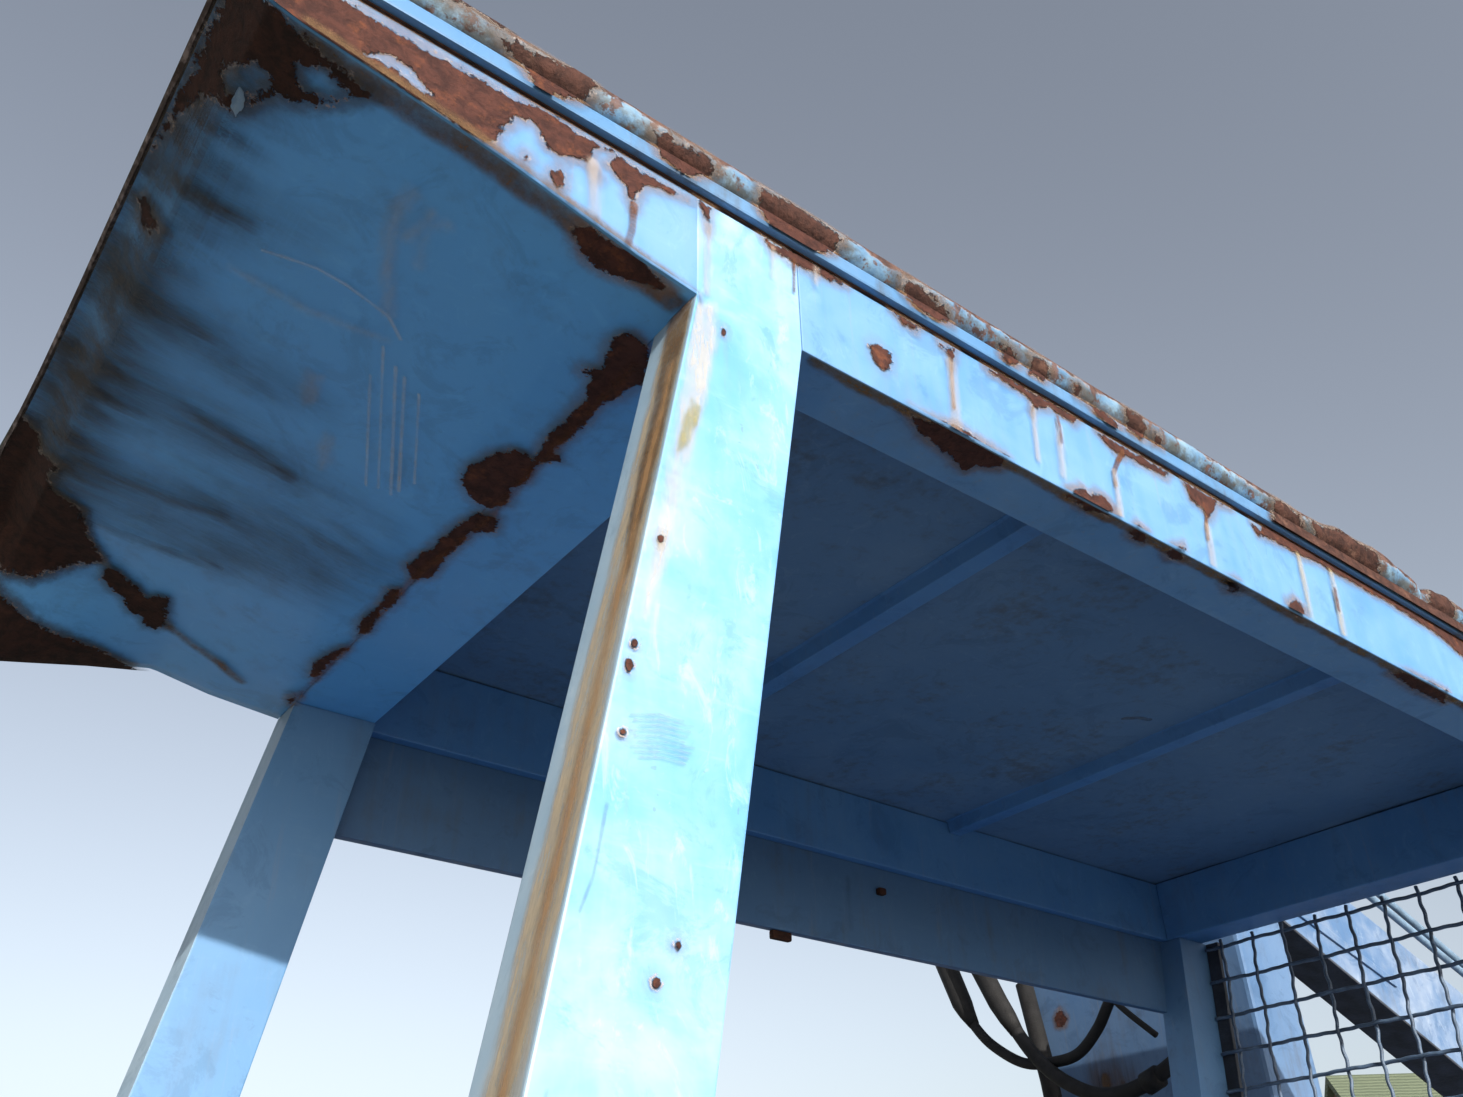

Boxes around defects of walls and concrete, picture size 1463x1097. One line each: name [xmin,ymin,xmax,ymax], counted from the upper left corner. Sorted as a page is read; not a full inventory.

peeling [231,87,245,117]
rust [754,184,848,292]
rust [892,272,954,331]
rust [0,414,243,683]
rust [150,0,726,1097]
rust [811,342,1463,707]